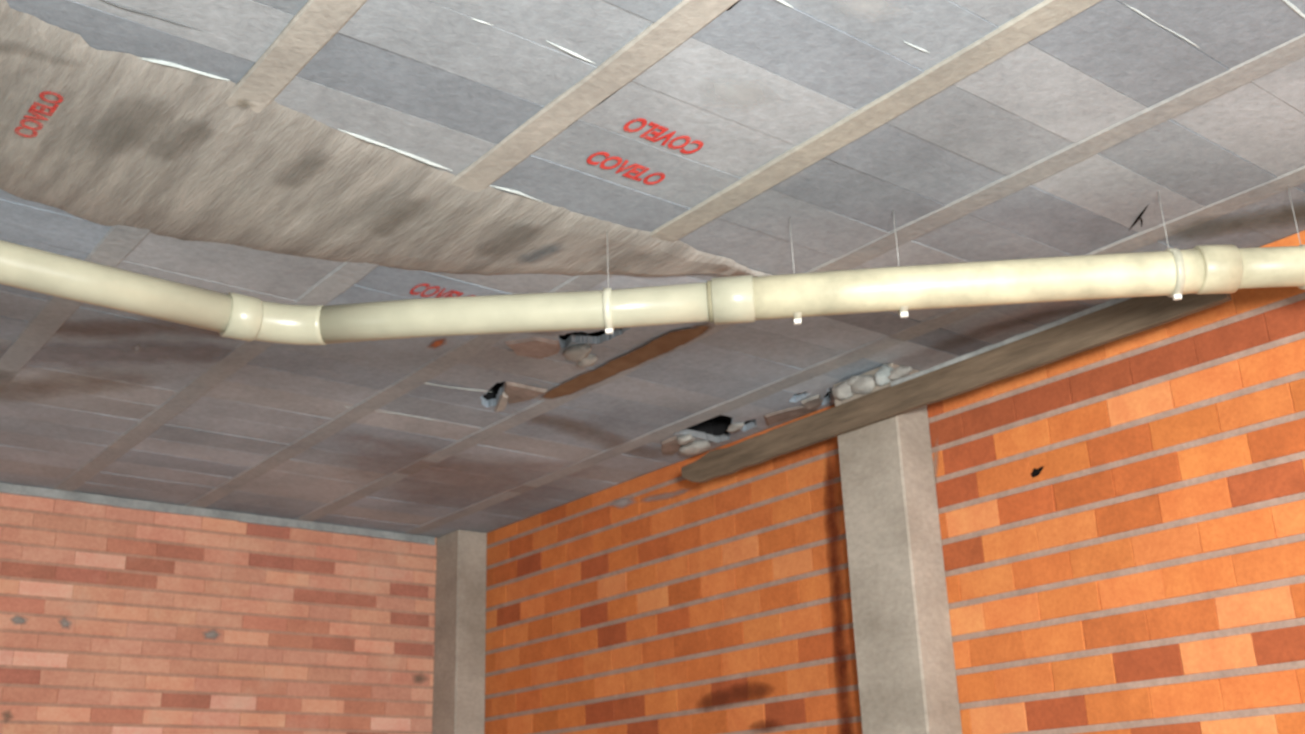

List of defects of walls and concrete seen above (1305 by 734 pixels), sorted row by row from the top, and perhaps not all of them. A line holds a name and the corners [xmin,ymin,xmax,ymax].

leakage [29,346,218,364]
spalling [504,328,617,368]
spalling [483,381,548,412]
spalling [661,387,831,456]